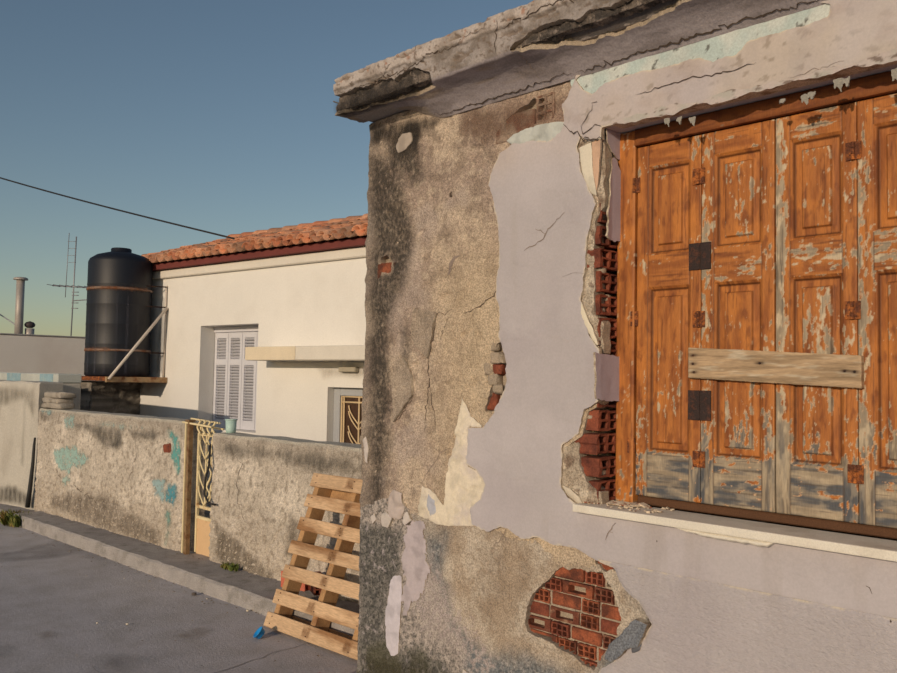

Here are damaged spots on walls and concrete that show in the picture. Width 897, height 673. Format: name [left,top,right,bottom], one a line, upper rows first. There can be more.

spalling [336,68,432,111]
crack [338,0,574,93]
crack [437,0,818,115]
damp [85,426,122,447]
damp [370,121,431,502]
crack [397,291,496,481]
spalling [356,0,830,673]
spalling [562,48,897,504]